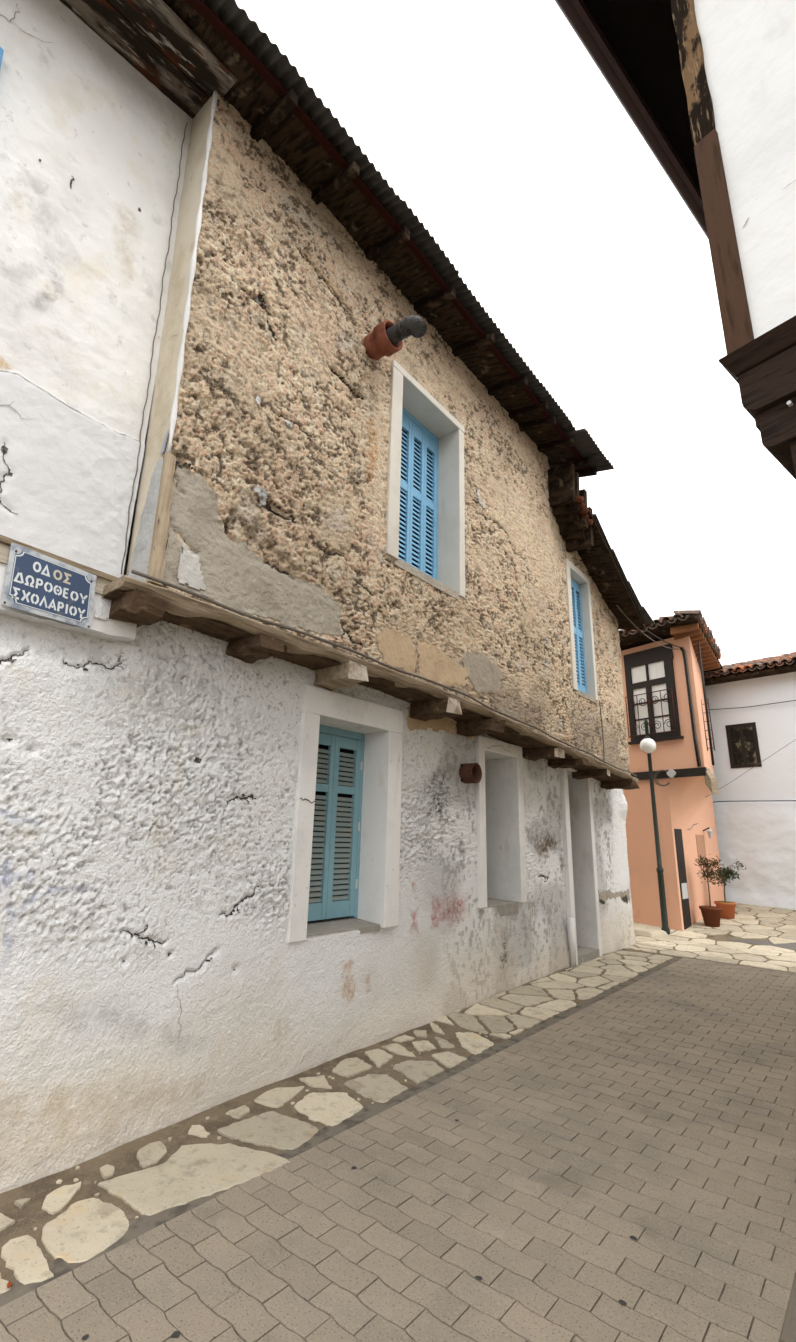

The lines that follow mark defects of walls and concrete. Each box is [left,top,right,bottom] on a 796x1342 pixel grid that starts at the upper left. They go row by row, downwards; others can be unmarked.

crack [0,401,31,514]
spalling [129,429,342,637]
crack [120,924,166,949]
crack [175,952,213,1041]